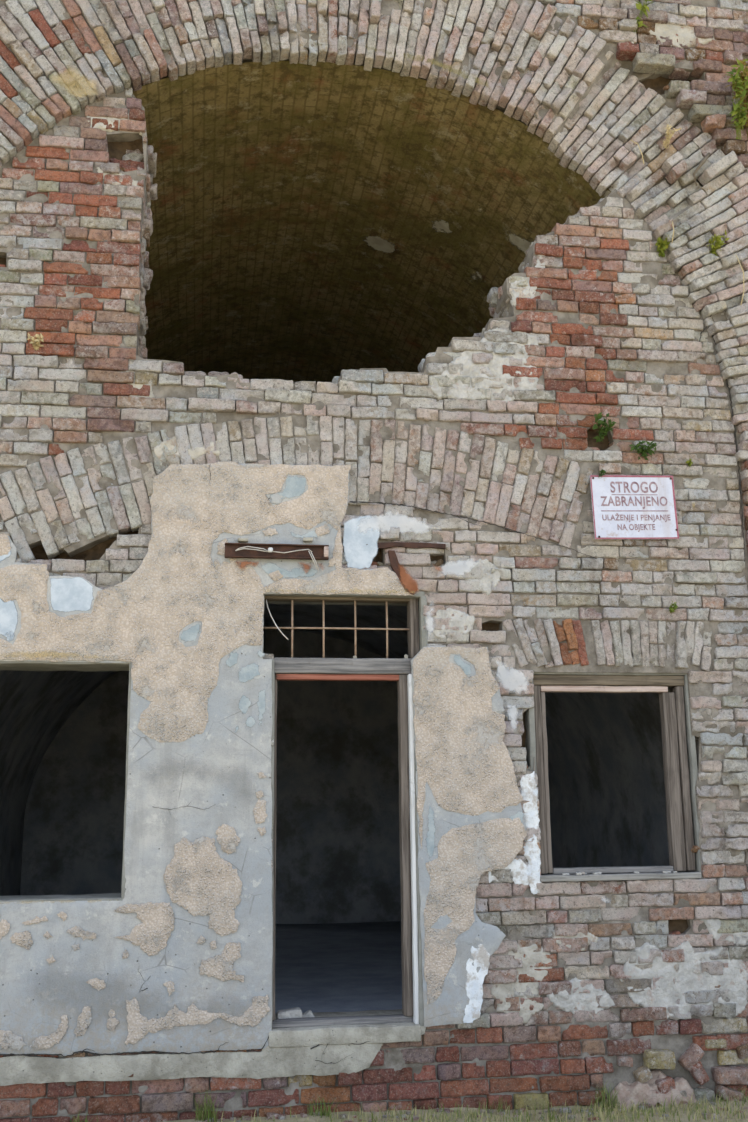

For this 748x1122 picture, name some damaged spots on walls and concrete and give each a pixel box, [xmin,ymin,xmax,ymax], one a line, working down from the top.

peeling [0,534,11,561]
peeling [50,577,93,612]
rust [399,565,418,594]
peeling [0,599,18,641]
peeling [462,711,542,894]
peeling [113,824,245,982]
peeling [0,911,96,951]
spalling [463,930,615,1024]
spalling [620,918,748,1022]
peeling [0,1006,92,1051]
crack [0,1036,269,1057]
peeling [107,981,270,1045]